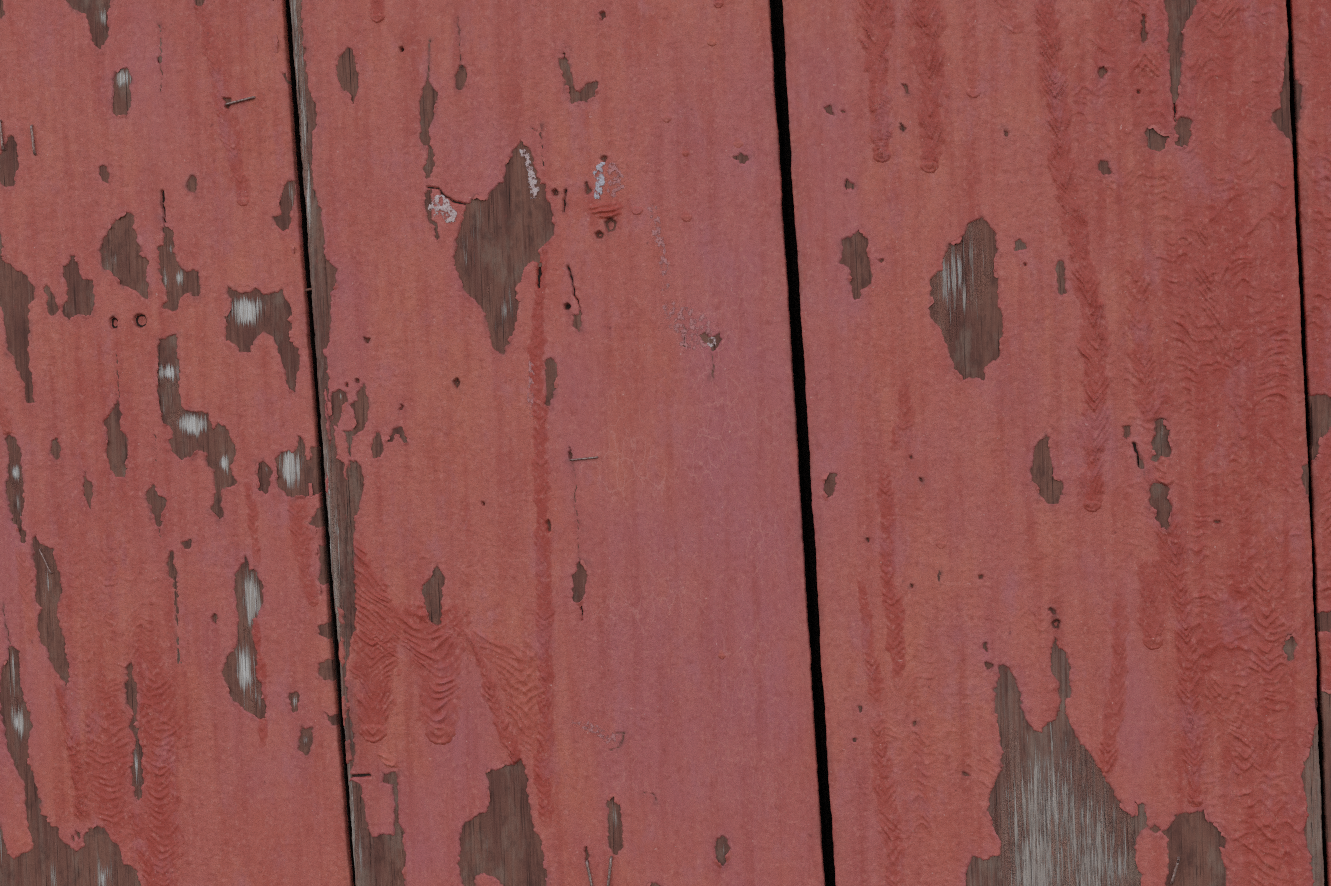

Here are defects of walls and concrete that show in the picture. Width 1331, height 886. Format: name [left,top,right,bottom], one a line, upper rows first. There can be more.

peeling [0,234,95,403]
peeling [100,212,200,312]
peeling [154,335,237,519]
peeling [223,288,300,394]
peeling [256,0,411,886]
peeling [453,139,556,354]
peeling [925,218,1005,382]
peeling [222,556,267,720]
peeling [0,647,144,886]
peeling [457,760,548,886]
peeling [966,638,1226,886]
peeling [1301,685,1331,886]